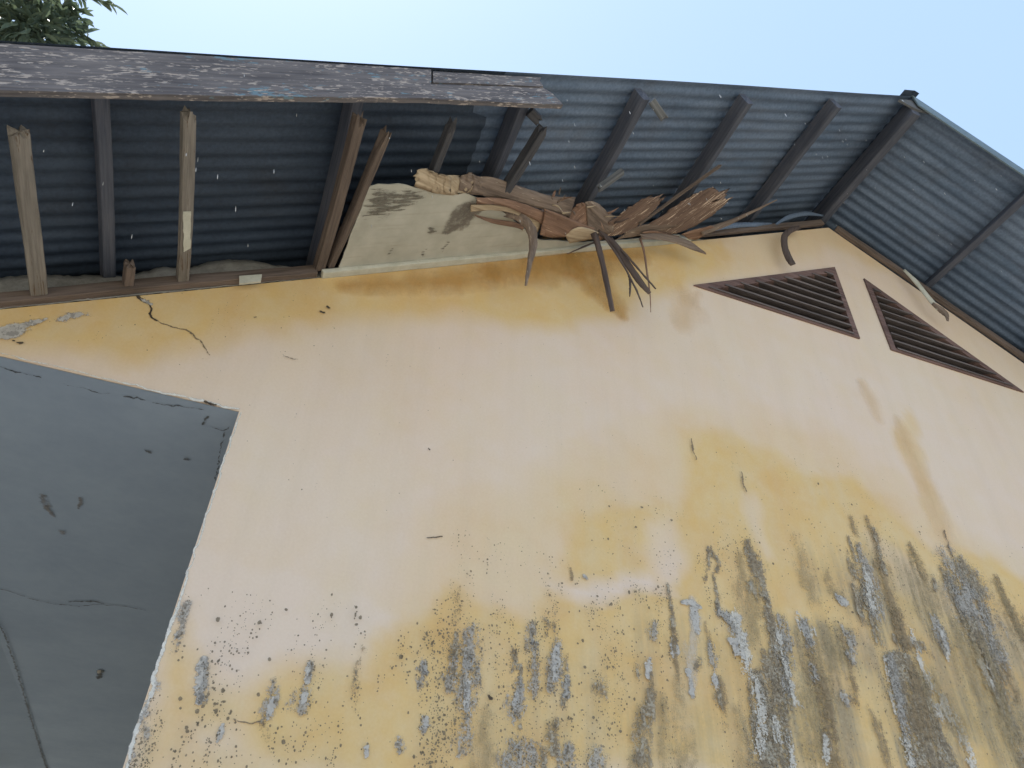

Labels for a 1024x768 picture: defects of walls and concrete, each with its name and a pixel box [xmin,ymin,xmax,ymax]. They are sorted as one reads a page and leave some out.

crack [136,295,210,355]
peeling [0,312,242,768]
water stain [128,591,288,768]
peeling [286,660,315,715]
water stain [254,606,369,767]
water stain [377,512,696,768]
peeling [636,657,657,704]
peeling [680,597,753,698]
peeling [795,611,821,684]
water stain [694,496,1024,768]
peeling [822,734,831,766]